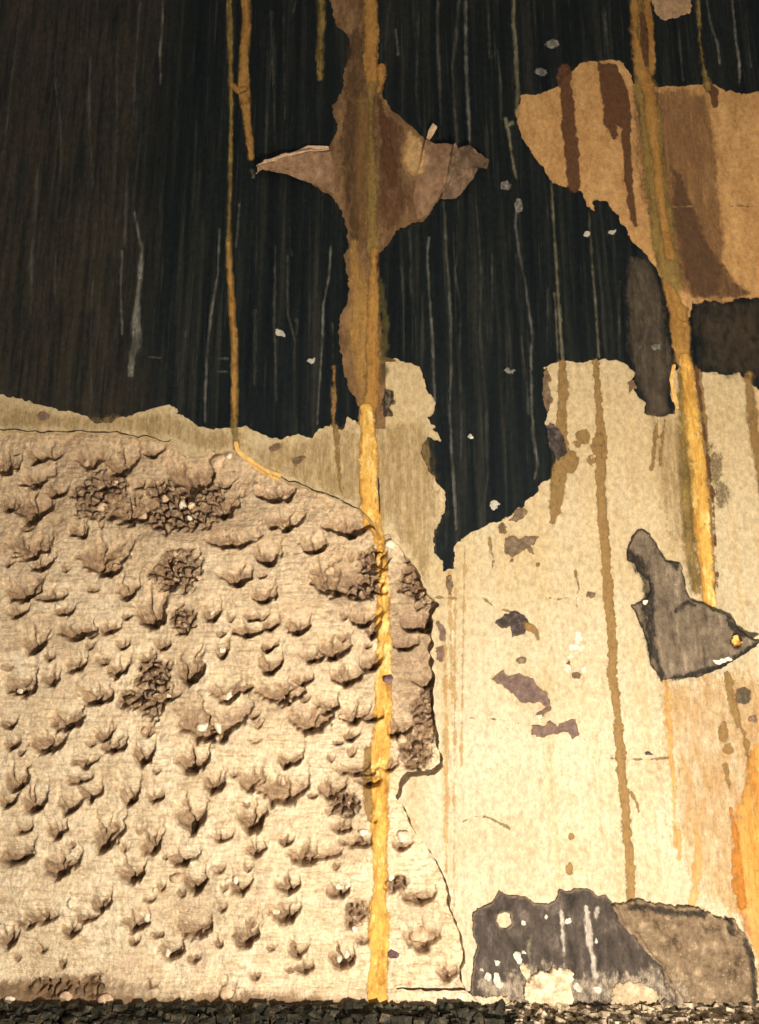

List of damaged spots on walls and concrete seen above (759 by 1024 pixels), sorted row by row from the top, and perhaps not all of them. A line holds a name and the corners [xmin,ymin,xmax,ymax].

peeling [651,0,692,20]
corrosion [226,0,281,481]
peeling [256,0,489,429]
damp [556,64,581,193]
peeling [516,59,664,284]
damp [597,61,652,227]
corrosion [630,0,719,608]
peeling [653,84,759,320]
corrosion [348,0,393,1007]
corrosion [718,671,759,957]
damp [472,910,574,1007]
damp [584,905,600,979]